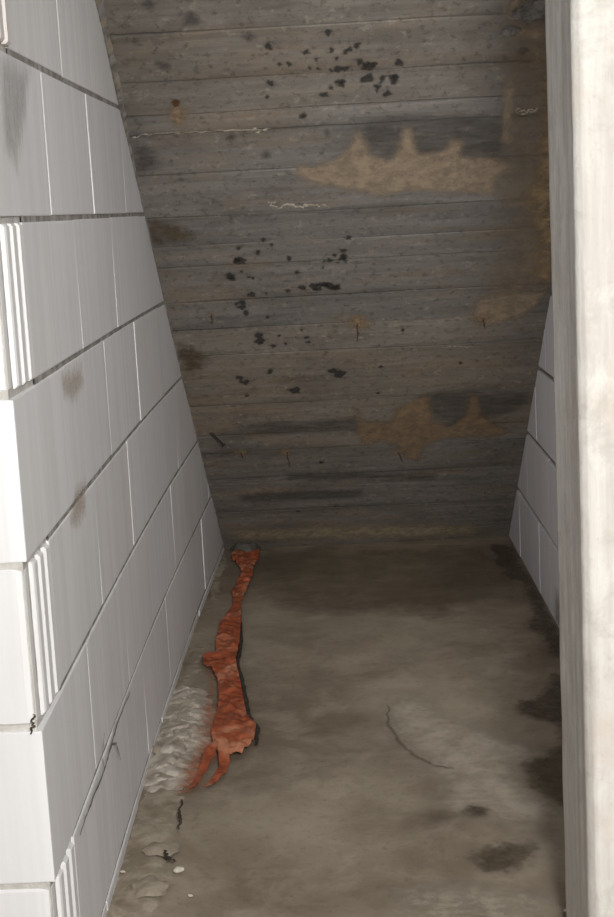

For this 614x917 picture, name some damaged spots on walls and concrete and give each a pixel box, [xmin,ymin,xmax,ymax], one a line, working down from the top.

spalling [500,0,545,37]
damp [297,25,548,326]
damp [520,673,562,727]
damp [389,693,563,822]
damp [473,843,530,871]